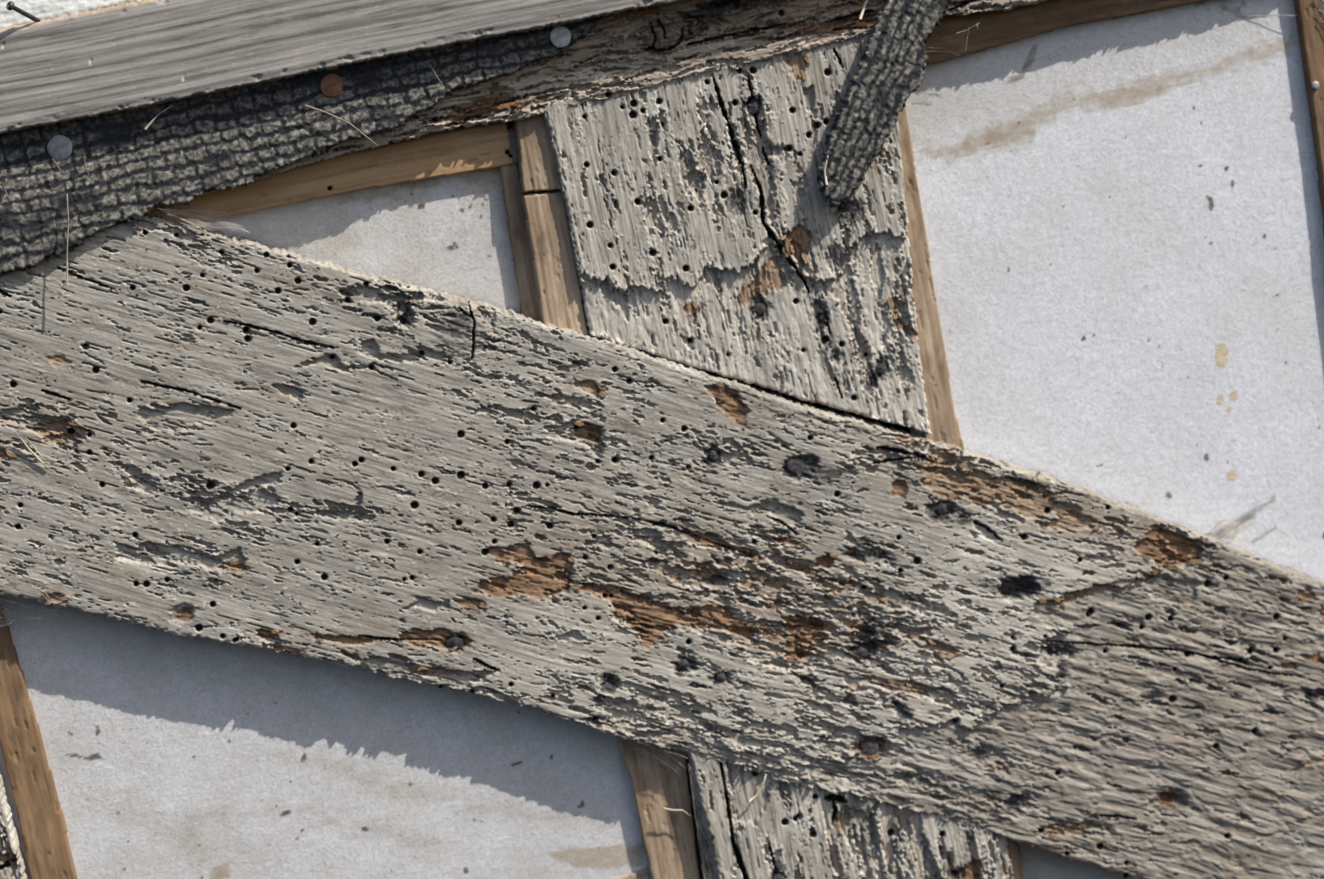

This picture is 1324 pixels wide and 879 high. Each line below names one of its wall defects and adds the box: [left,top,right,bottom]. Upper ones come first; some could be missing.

crack [648,18,787,52]
crack [824,9,874,68]
crack [713,75,831,335]
crack [834,377,843,399]
peeling [456,530,857,663]
peeling [1038,525,1203,608]
crack [719,761,778,879]